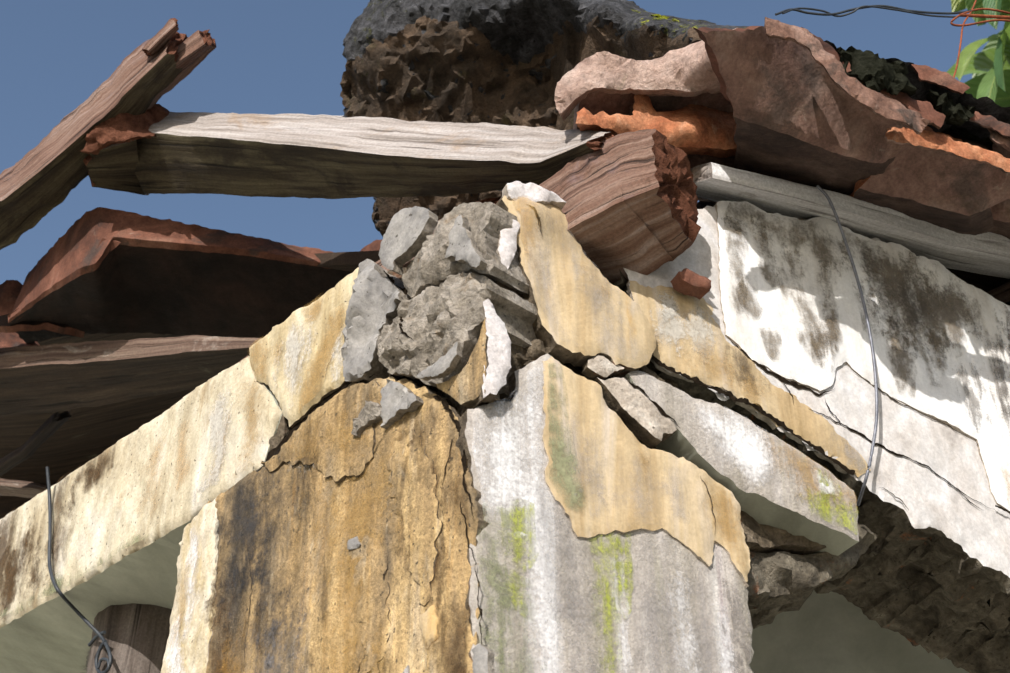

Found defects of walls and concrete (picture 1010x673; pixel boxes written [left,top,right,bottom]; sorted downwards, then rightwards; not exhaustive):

peeling [379,206,438,275]
peeling [445,214,487,271]
flaking render [496,220,520,269]
crack [383,271,413,340]
leakage [726,203,1010,430]
leakage [0,517,36,614]
crack [257,336,482,644]
leakage [479,396,557,673]
crack [557,360,681,429]
flaking render [542,355,751,588]
efflorescence [702,410,773,481]
crack [651,336,1010,513]